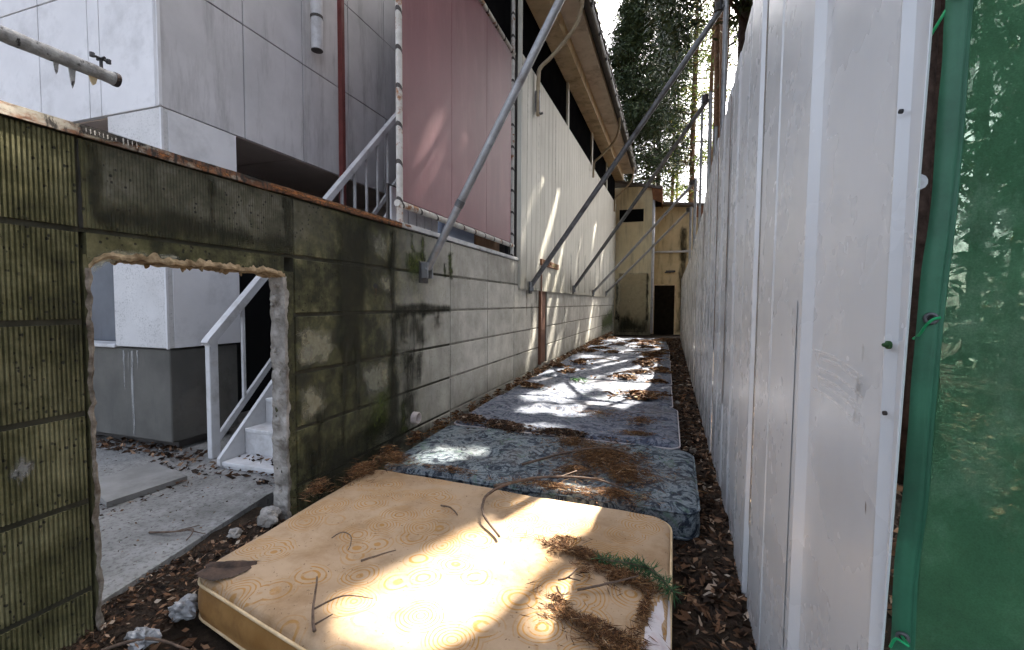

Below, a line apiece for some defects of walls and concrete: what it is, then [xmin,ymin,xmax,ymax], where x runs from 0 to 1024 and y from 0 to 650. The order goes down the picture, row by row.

corrosion [270,185,411,227]
water stain [123,350,138,403]
spalling [85,251,331,631]
water stain [309,221,451,504]